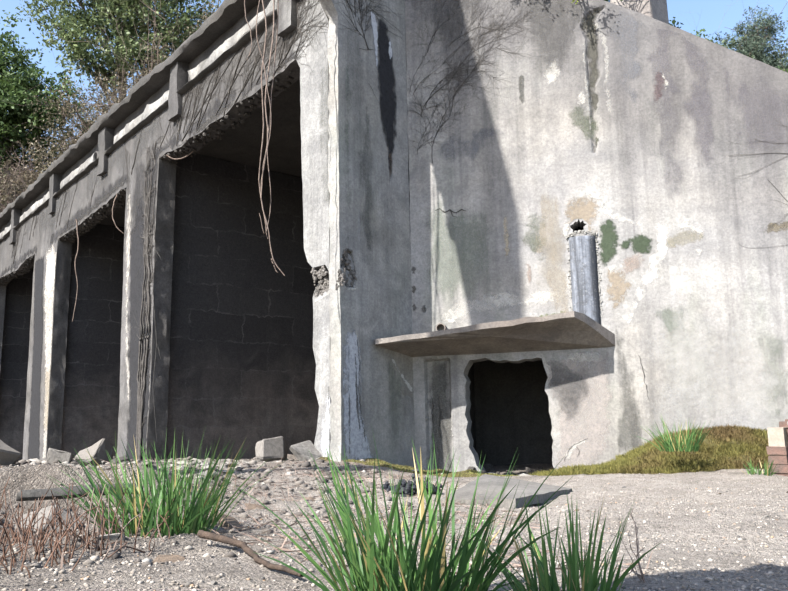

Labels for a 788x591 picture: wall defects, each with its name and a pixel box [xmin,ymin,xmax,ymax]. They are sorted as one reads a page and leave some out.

leakage [371,12,397,172]
leakage [573,107,596,138]
spalling [563,191,603,236]
spalling [0,255,35,286]
spalling [310,248,357,302]
peeling [42,179,131,458]